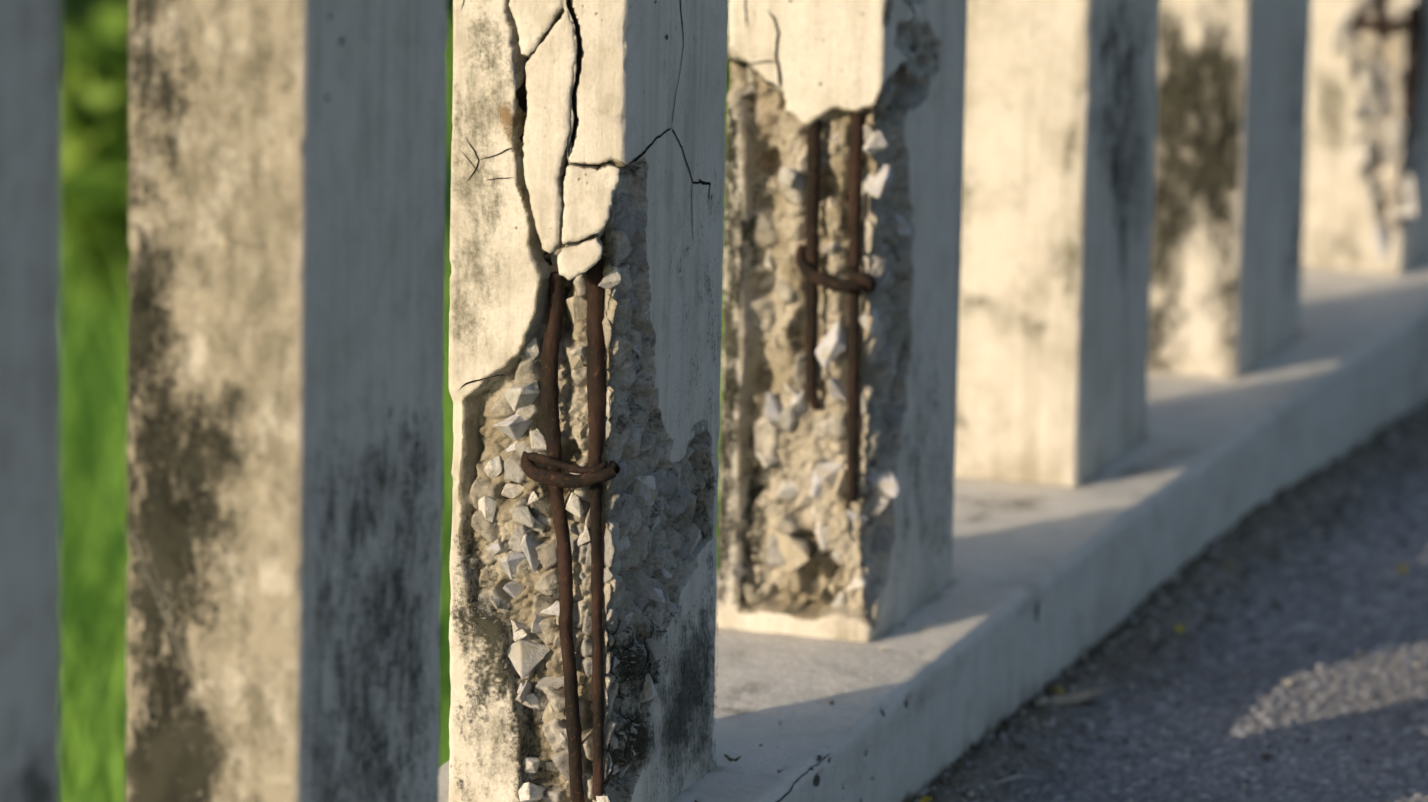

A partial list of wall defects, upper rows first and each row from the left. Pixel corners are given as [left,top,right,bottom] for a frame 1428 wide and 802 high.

leakage [126,0,291,802]
crack [460,69,528,183]
crack [543,252,553,266]
spalling [458,0,715,802]
crack [566,0,711,227]
spalling [727,0,942,629]
leakage [1092,0,1244,375]
leakage [296,401,559,802]
spalling [808,755,831,787]